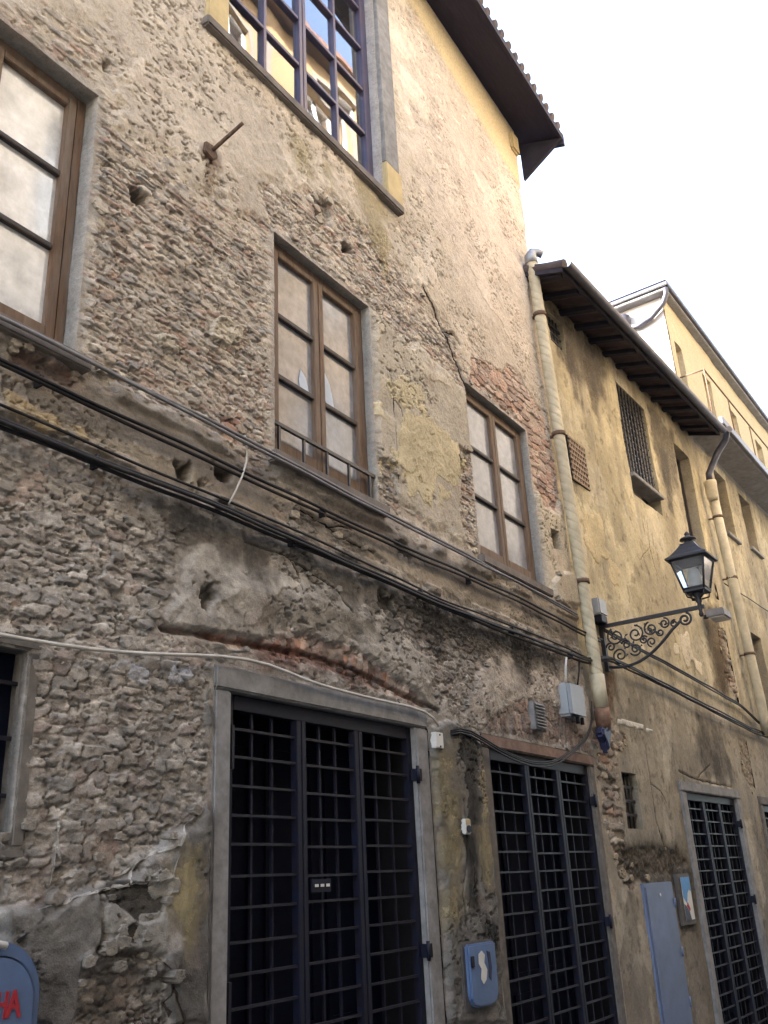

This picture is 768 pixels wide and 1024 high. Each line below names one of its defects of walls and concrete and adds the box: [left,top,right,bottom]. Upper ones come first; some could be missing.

crack [423,287,465,386]
peeling [373,375,480,554]
flaking render [468,355,559,513]
flaking render [92,818,126,864]
spalling [619,842,688,883]
peeling [97,868,181,960]